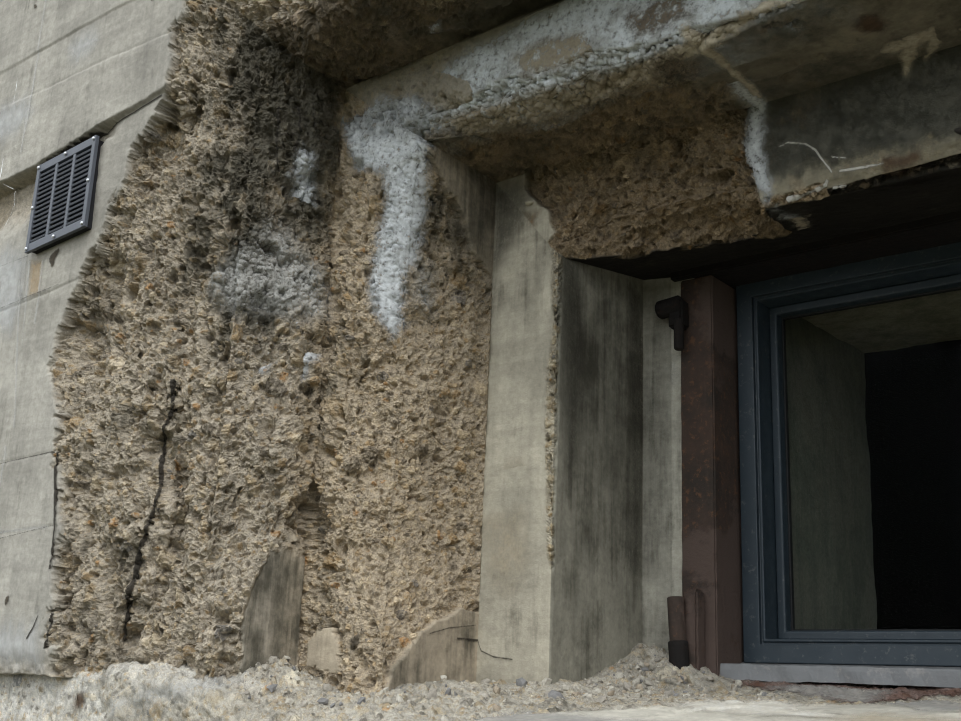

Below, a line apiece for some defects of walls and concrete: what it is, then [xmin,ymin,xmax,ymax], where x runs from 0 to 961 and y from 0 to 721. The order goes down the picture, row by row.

leakage [344,0,961,333]
crack [1,451,59,569]
crack [123,379,177,641]
spalling [42,0,829,695]